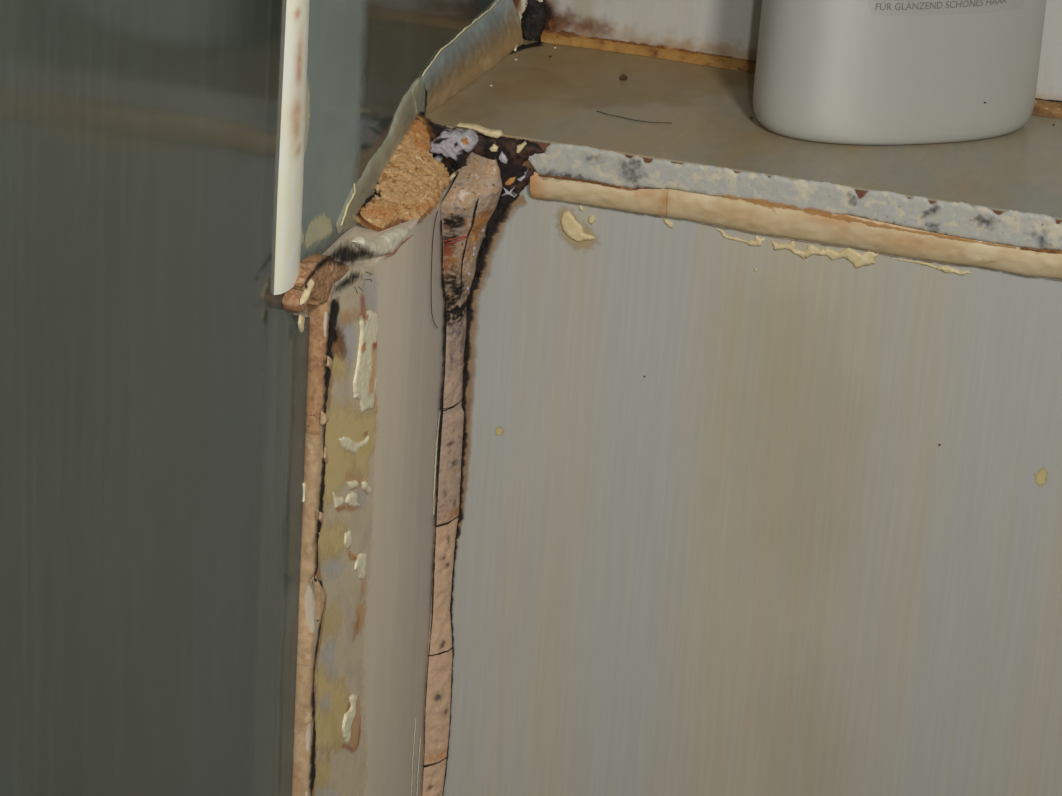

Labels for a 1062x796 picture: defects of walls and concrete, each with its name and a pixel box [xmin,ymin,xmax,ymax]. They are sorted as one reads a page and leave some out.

peeling [430,128,479,170]
peeling [528,143,1062,251]
crack [446,198,479,314]
peeling [353,310,379,412]
peeling [339,431,370,454]
peeling [333,480,372,511]
crack [311,299,336,796]
peeling [344,530,367,580]
peeling [342,694,357,744]